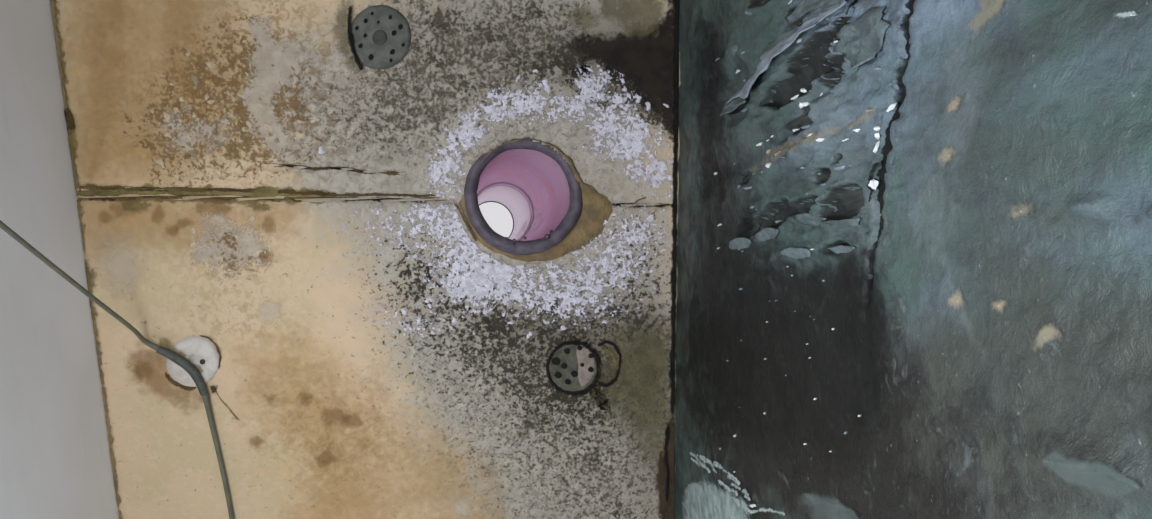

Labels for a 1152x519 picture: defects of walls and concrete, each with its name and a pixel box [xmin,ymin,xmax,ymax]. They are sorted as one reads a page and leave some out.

crack [50,0,477,519]
leakage [326,0,785,519]
spalling [717,155,864,267]
peeling [715,0,890,190]
crack [865,0,915,305]
leakage [806,494,857,519]